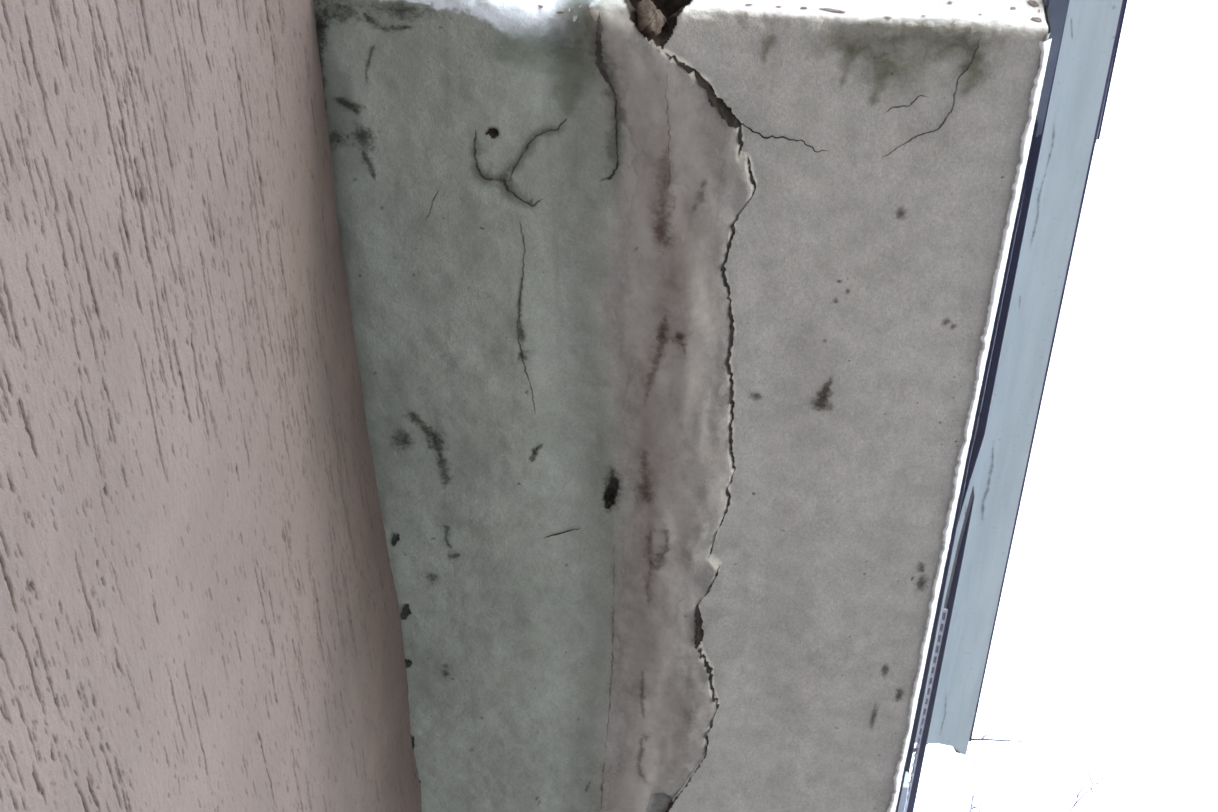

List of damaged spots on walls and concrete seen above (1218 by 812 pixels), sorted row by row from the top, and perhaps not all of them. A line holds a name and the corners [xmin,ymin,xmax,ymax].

crack [594,12,619,181]
spalling [625,0,693,53]
crack [883,40,979,157]
crack [474,117,568,412]
crack [665,53,830,812]